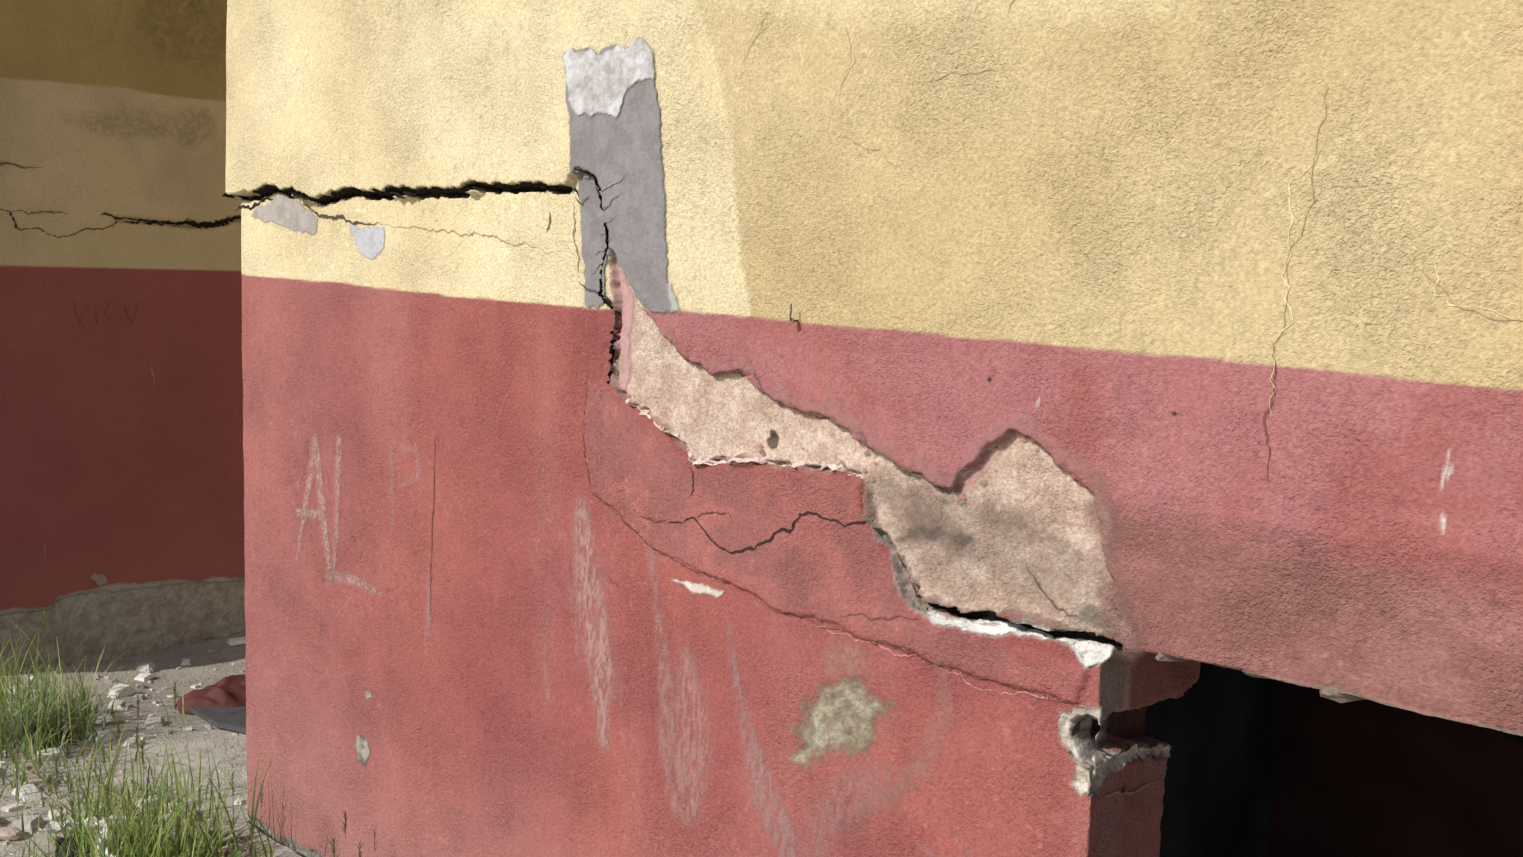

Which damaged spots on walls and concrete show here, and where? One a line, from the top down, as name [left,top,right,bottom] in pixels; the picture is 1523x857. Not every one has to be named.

crack [0,161,43,169]
peeling [252,194,317,235]
peeling [349,224,385,259]
crack [1262,86,1336,483]
crack [0,168,1123,707]
spalling [609,258,1190,668]
spalling [0,573,246,672]
peeling [793,648,887,763]
spalling [1059,708,1171,797]
spalling [1320,685,1368,703]